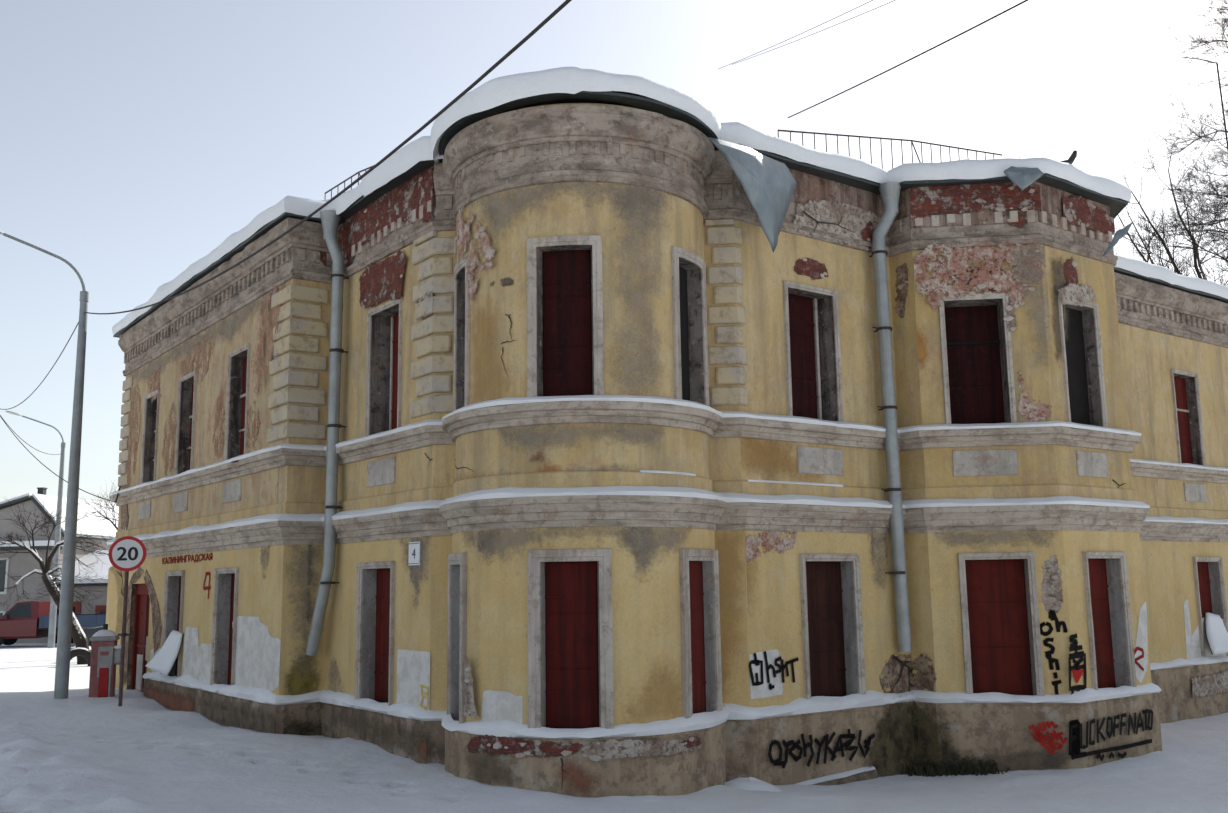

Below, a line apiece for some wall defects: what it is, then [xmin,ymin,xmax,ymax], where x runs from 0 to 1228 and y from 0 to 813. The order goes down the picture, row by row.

flaking render [319,165,434,269]
flaking render [793,200,887,250]
flaking render [1062,195,1115,235]
flaking render [359,250,406,310]
flaking render [454,205,514,310]
flaking render [794,257,828,280]
flaking render [895,182,1046,332]
flaking render [1057,257,1097,307]
crack [501,314,514,376]
flaking render [1041,555,1063,616]
flaking render [467,735,583,758]